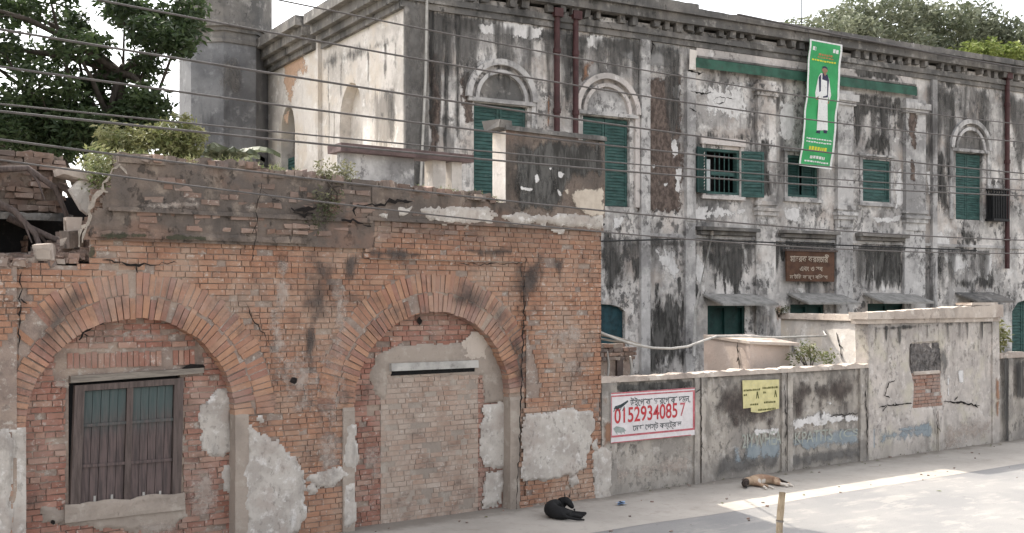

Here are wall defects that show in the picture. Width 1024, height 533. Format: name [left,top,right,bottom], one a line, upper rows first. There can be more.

damp [384,5,513,165]
flaking render [637,74,684,213]
damp [854,94,902,155]
damp [914,82,990,210]
crack [250,183,316,269]
crack [341,198,412,227]
flaking render [136,177,624,242]
crack [17,272,27,359]
damp [700,242,754,308]
spalling [909,342,964,408]
flaking render [244,415,359,533]
flaking render [521,407,612,498]